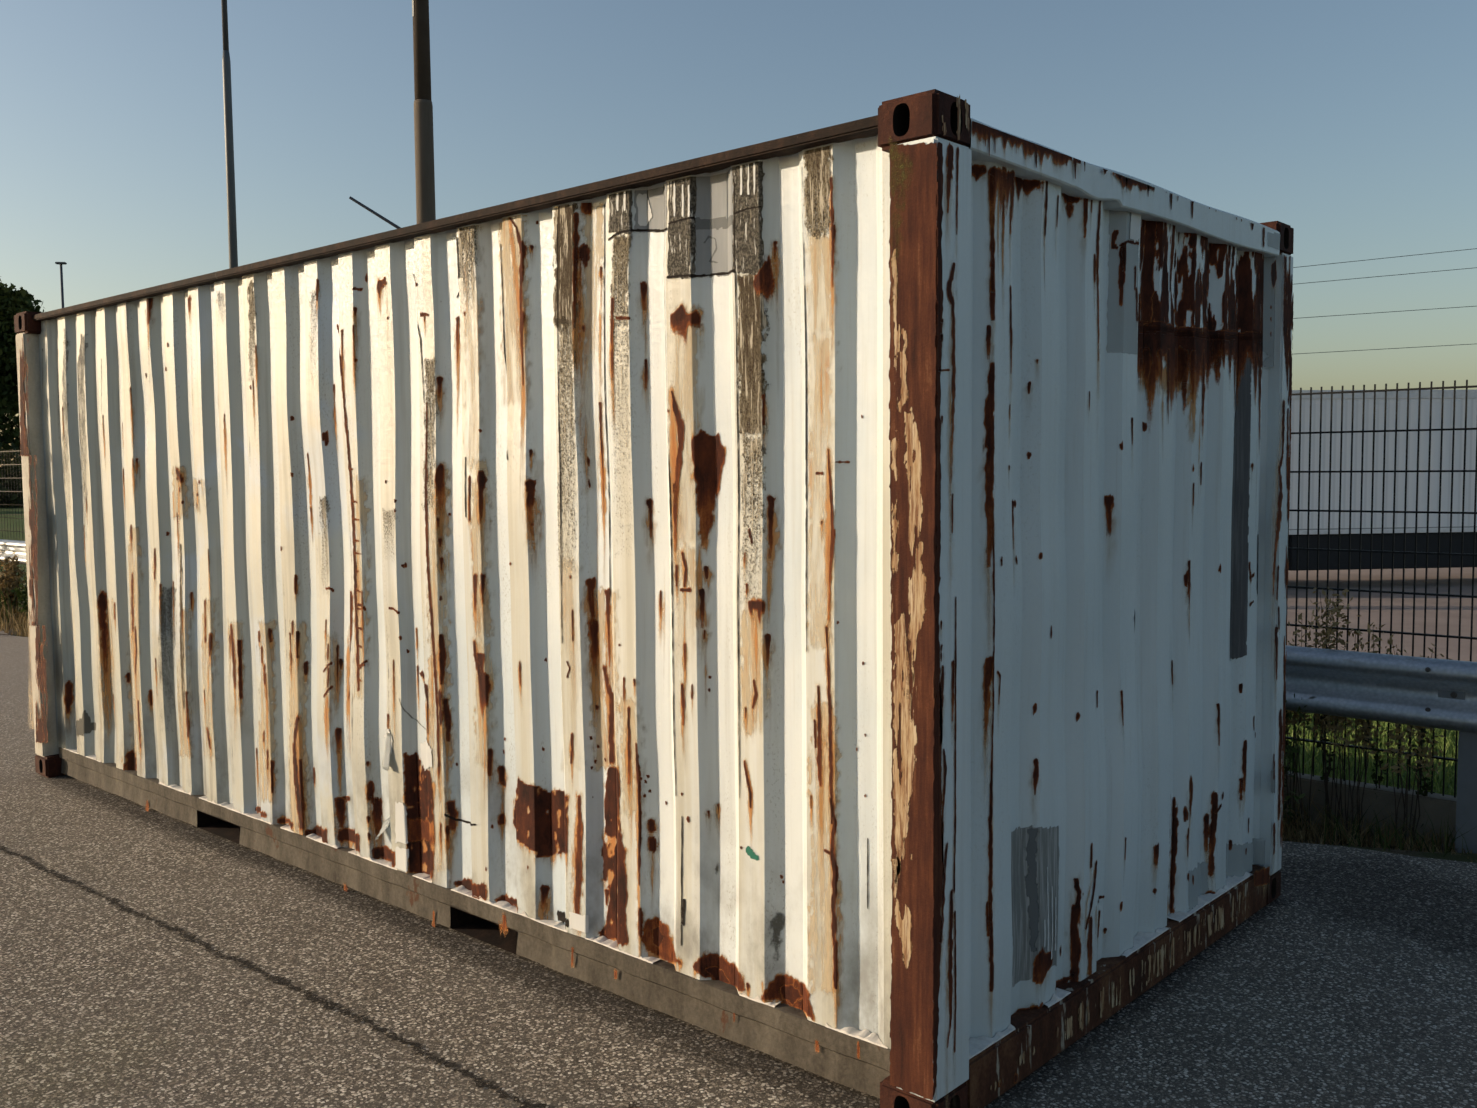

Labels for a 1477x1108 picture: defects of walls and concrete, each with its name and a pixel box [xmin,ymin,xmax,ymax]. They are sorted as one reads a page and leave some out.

corrosion [508,217,541,553]
corrosion [572,202,647,538]
peeling [608,177,697,279]
peeling [732,161,765,275]
corrosion [97,573,157,771]
corrosion [153,453,518,932]
crack [444,814,476,826]
corrosion [473,573,815,1022]
crack [667,423,683,946]
corrosion [659,387,726,737]
corrosion [810,448,850,1025]
corrosion [888,121,1294,1100]